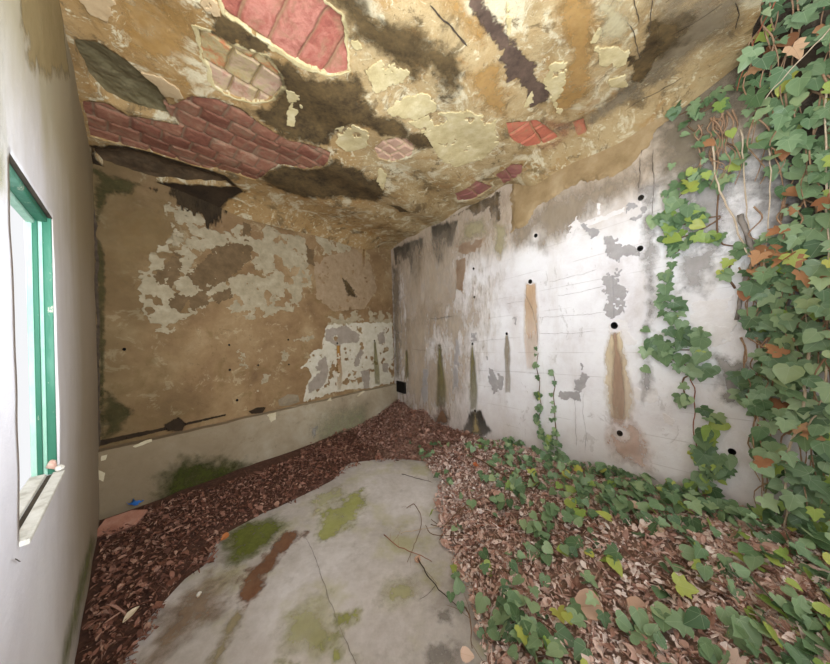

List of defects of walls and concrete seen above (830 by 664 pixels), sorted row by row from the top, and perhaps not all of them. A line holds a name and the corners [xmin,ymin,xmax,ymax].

spalling [191,0,362,127]
water stain [211,14,433,150]
water stain [336,0,506,116]
crack [430,5,468,47]
peeling [387,61,587,167]
water stain [658,0,830,233]
water stain [263,159,384,202]
peeling [137,202,394,402]
corrosion [525,284,536,329]
peeling [566,202,647,345]
corrosion [606,333,647,466]
crack [307,540,356,663]